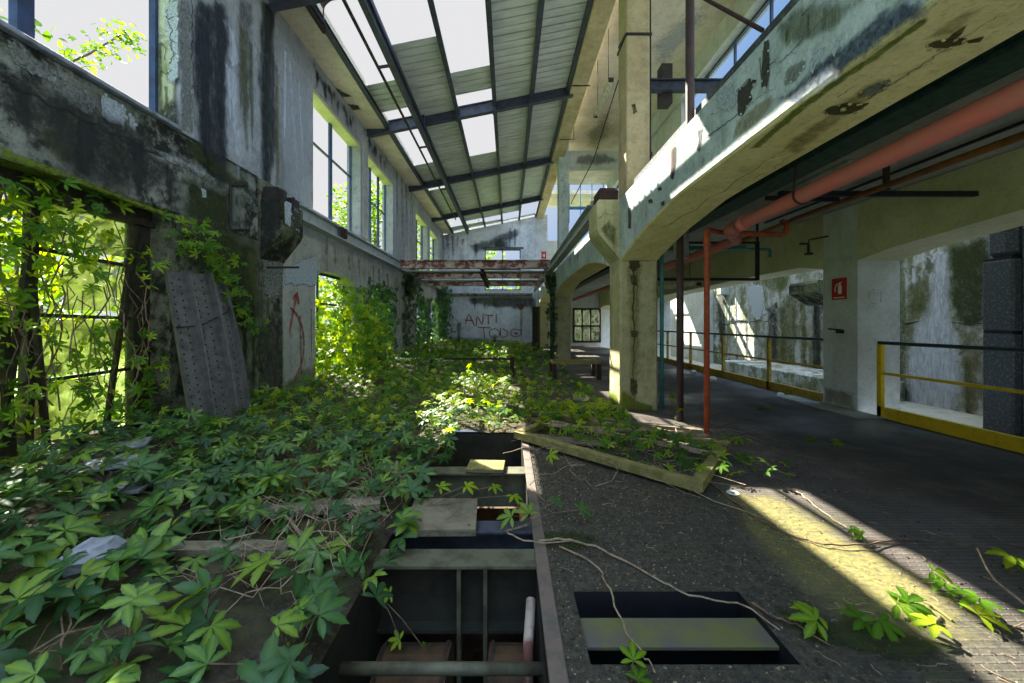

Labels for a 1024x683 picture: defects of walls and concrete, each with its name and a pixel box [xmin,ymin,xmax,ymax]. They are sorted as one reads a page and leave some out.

spalling [925,26,984,51]
peeling [7,40,137,131]
leakage [186,0,360,231]
peeling [716,39,770,116]
spalling [822,79,891,116]
leakage [443,229,518,252]
leakage [768,303,779,362]
leakage [812,305,821,369]
leakage [909,253,978,414]